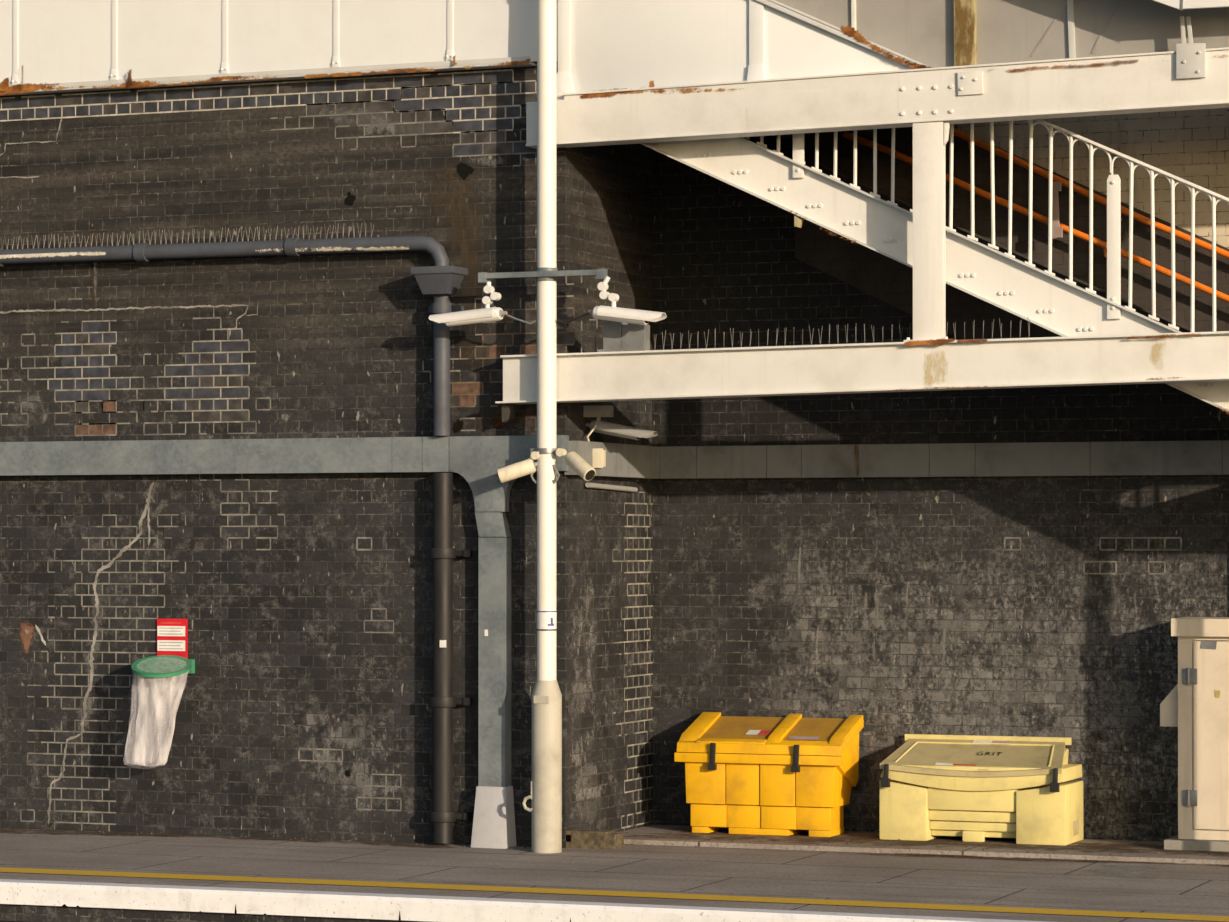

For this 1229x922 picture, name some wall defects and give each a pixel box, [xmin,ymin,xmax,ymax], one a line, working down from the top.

corrosion [840,25,932,69]
corrosion [954,0,974,66]
corrosion [0,66,275,95]
corrosion [304,68,435,78]
crack [47,482,158,824]